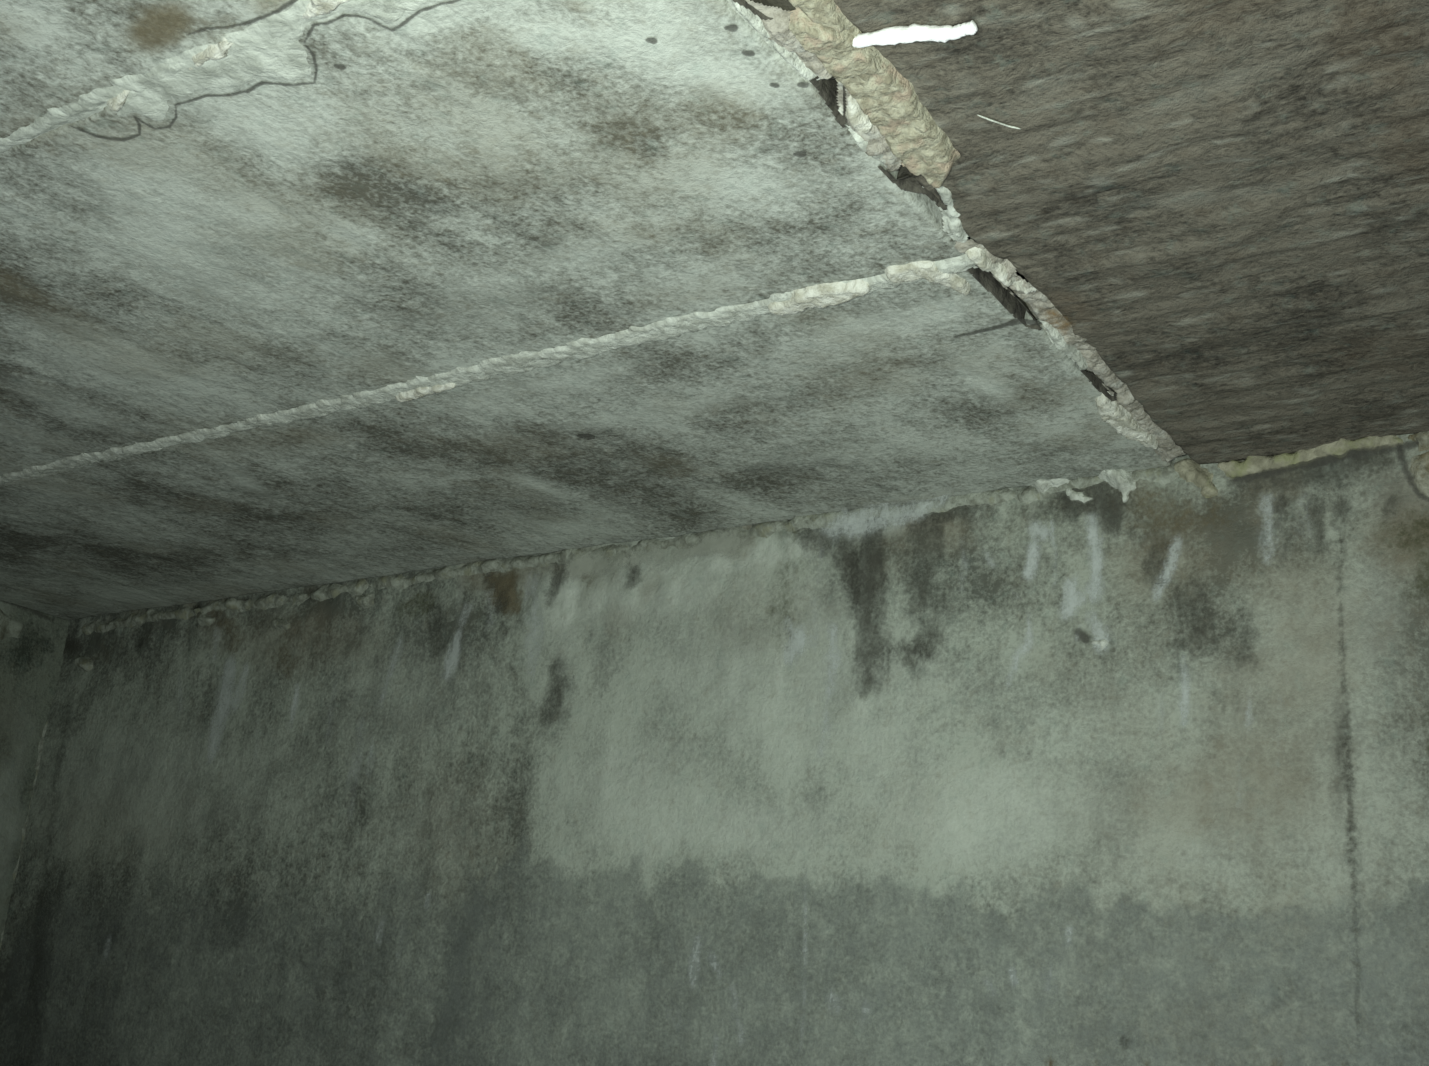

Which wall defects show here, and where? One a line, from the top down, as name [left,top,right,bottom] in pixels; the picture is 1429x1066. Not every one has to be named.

crack [71,0,459,142]
spalling [724,0,1185,463]
crack [954,319,1040,337]
water stain [804,517,884,686]
water stain [1024,481,1214,617]